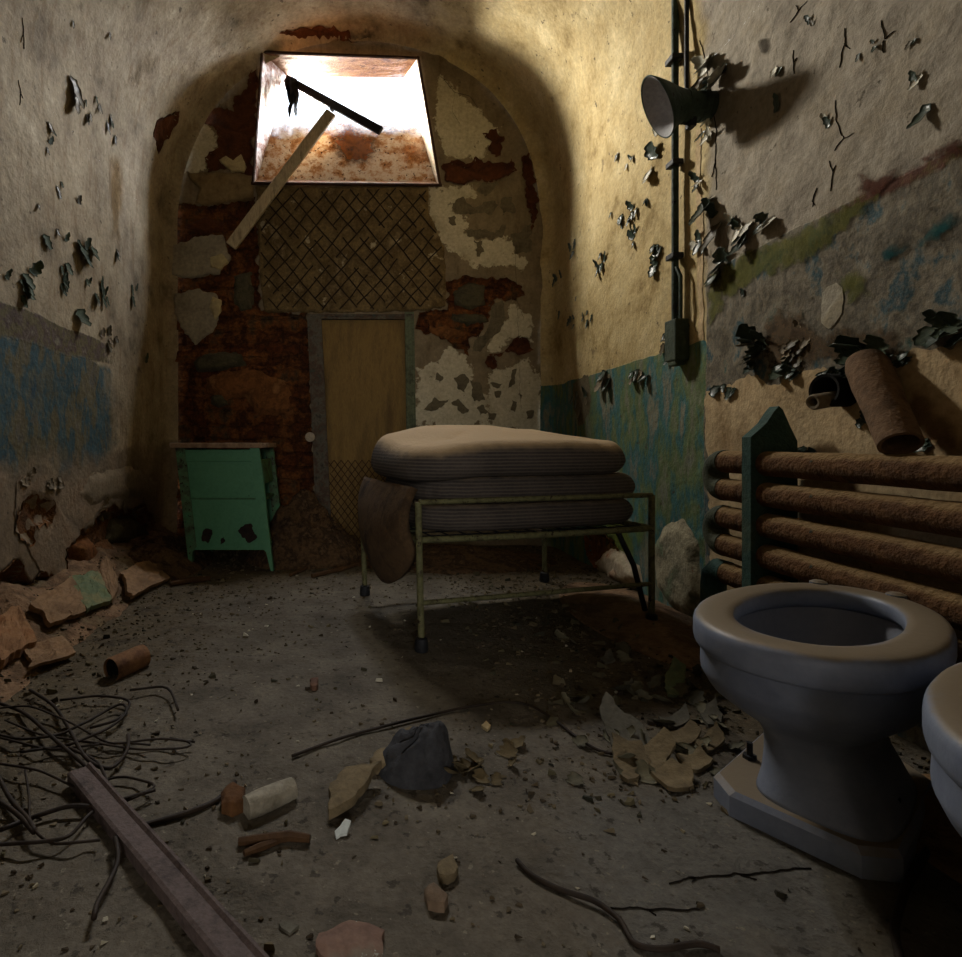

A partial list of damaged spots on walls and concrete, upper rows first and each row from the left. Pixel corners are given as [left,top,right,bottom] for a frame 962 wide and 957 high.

crack [839,28,850,68]
crack [881,20,894,53]
spalling [153,111,180,154]
spalling [204,67,259,176]
spalling [441,128,540,257]
peeling [688,118,776,340]
crack [812,100,853,207]
spalling [172,197,315,506]
spalling [415,275,533,369]
peeling [704,283,962,456]
peeling [0,467,156,585]
peeling [798,479,962,502]